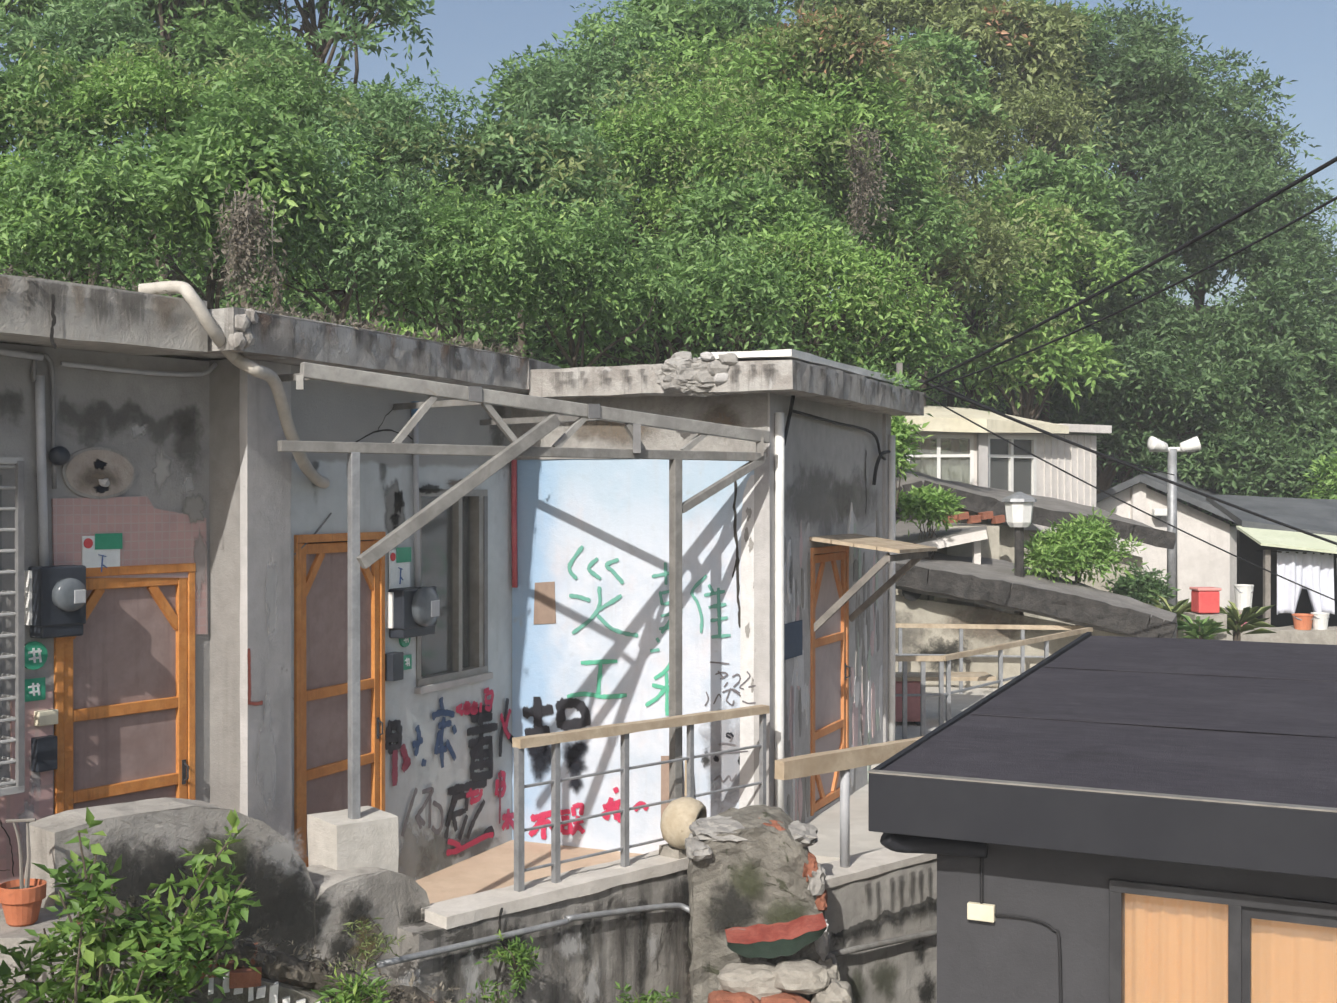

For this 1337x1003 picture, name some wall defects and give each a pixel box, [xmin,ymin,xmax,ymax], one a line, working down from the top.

crack [49,294,57,349]
water stain [25,280,175,322]
spalling [655,351,738,397]
water stain [61,402,196,462]
crack [732,481,741,628]